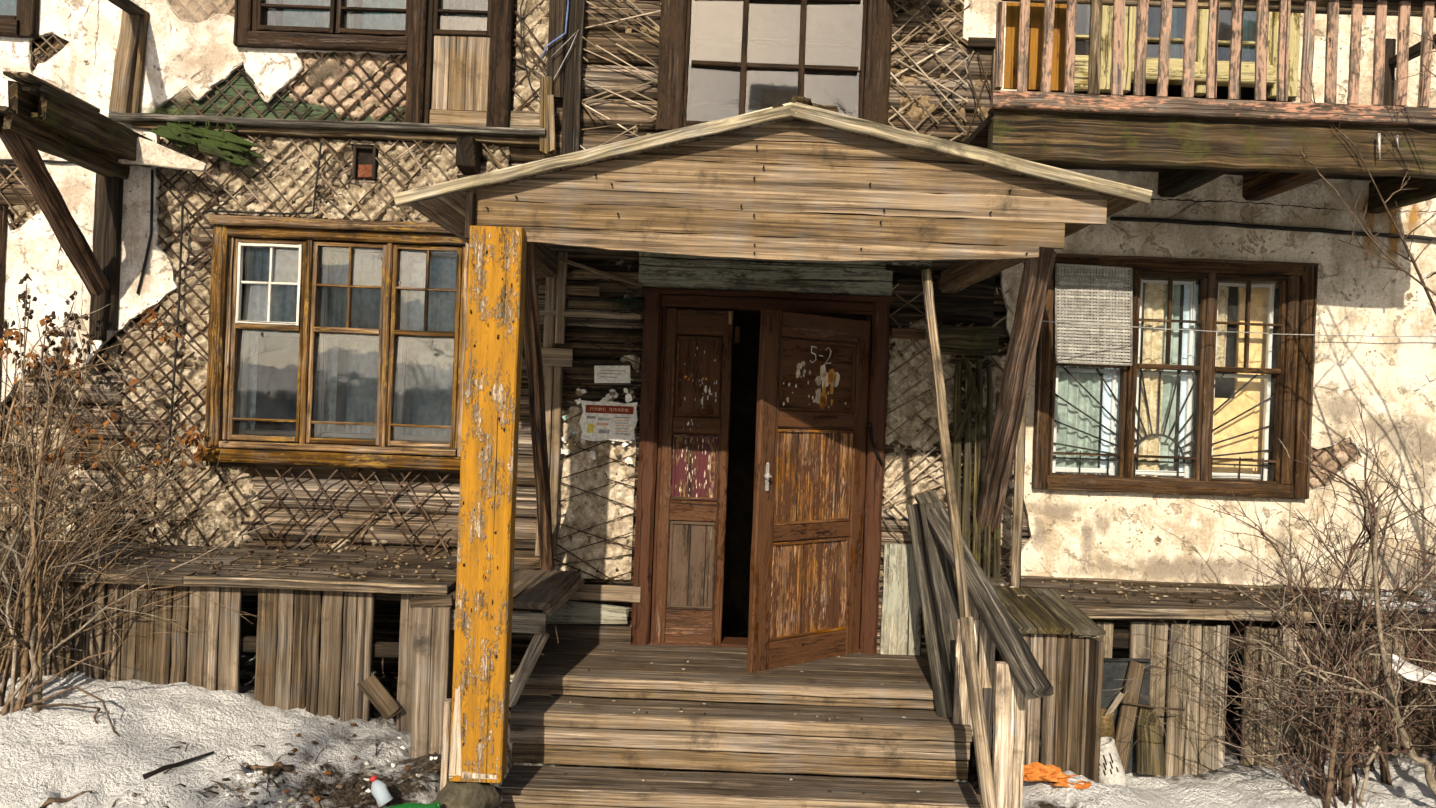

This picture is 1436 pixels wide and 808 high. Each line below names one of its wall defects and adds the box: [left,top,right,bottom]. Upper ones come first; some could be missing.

spalling [147,0,235,61]
spalling [29,31,72,74]
spalling [482,142,511,172]
rust [1363,197,1419,257]
spalling [0,51,460,556]
spalling [1309,437,1363,490]
damp [1035,506,1072,543]
damp [1084,517,1105,553]
damp [1148,561,1246,580]
damp [1367,558,1436,583]